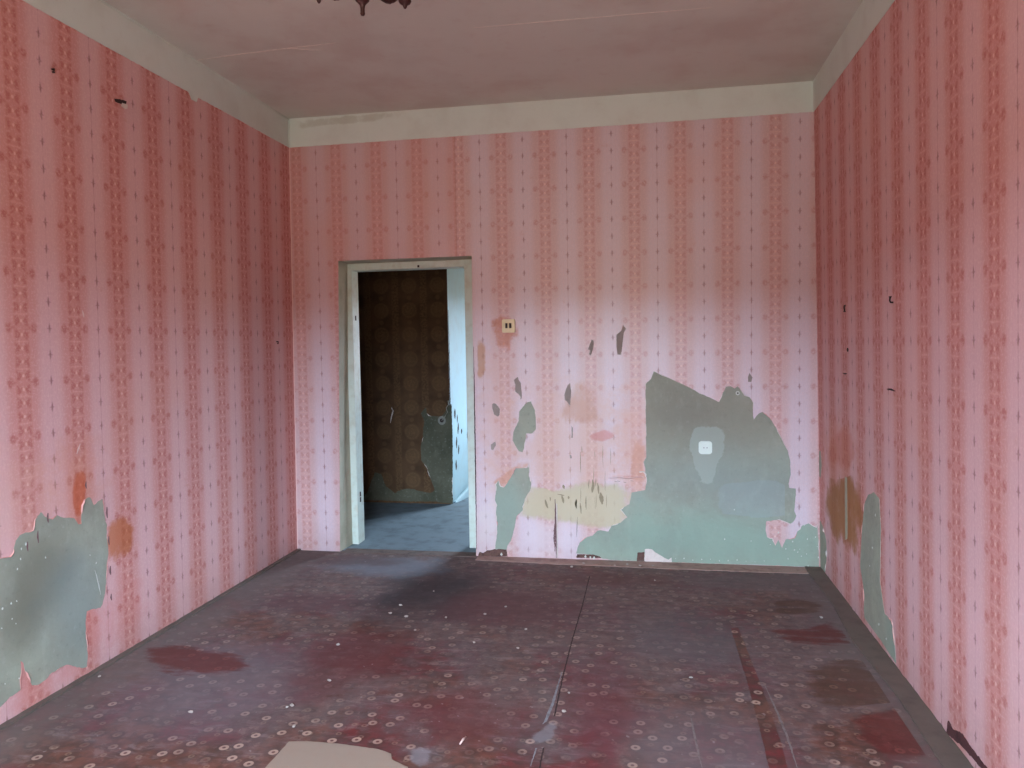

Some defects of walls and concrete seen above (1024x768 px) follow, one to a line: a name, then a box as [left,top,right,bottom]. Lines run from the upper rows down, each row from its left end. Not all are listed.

flaking render [0,483,112,707]
flaking render [364,405,468,504]
flaking render [478,464,532,557]
flaking render [513,397,536,452]
flaking render [576,372,827,572]
damp [820,419,871,569]
flaking render [860,492,896,663]